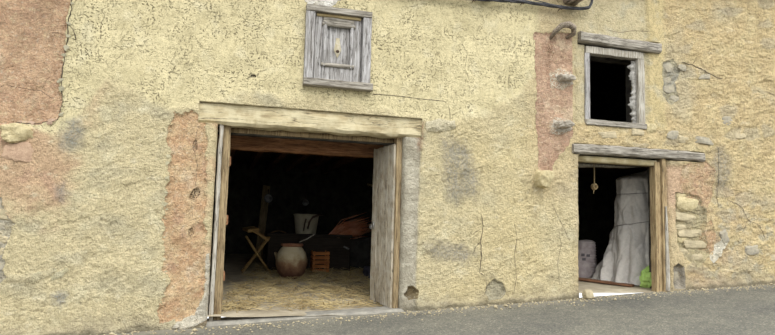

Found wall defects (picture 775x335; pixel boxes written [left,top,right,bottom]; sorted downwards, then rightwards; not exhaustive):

peeling [0,0,74,126]
peeling [533,32,574,171]
peeling [157,110,208,323]
spalling [404,286,419,300]
crack [472,216,487,297]
spalling [485,279,506,300]
spalling [673,161,717,289]